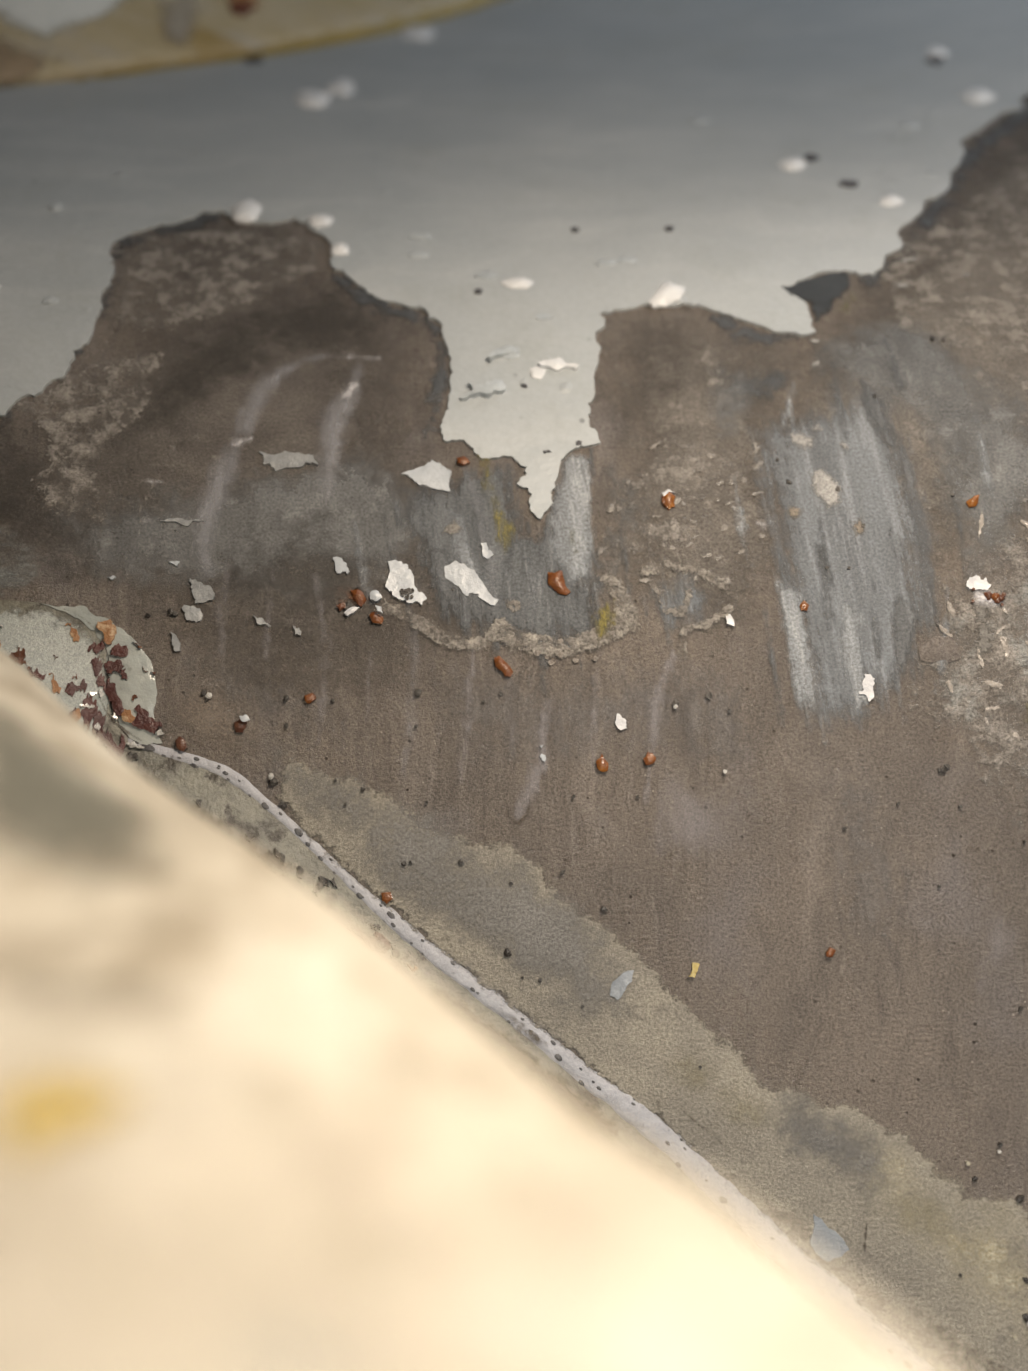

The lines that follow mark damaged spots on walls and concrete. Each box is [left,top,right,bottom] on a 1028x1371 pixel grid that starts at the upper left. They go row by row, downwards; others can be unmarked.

peeling [596,96,1028,628]
damp [782,399,819,447]
peeling [0,212,498,704]
damp [433,515,478,616]
peeling [547,570,571,596]
damp [819,381,947,708]
damp [770,581,814,707]
peeling [482,655,513,703]
peeling [858,674,875,702]
peeling [234,714,250,733]
peeling [615,714,627,731]
peeling [596,754,608,772]